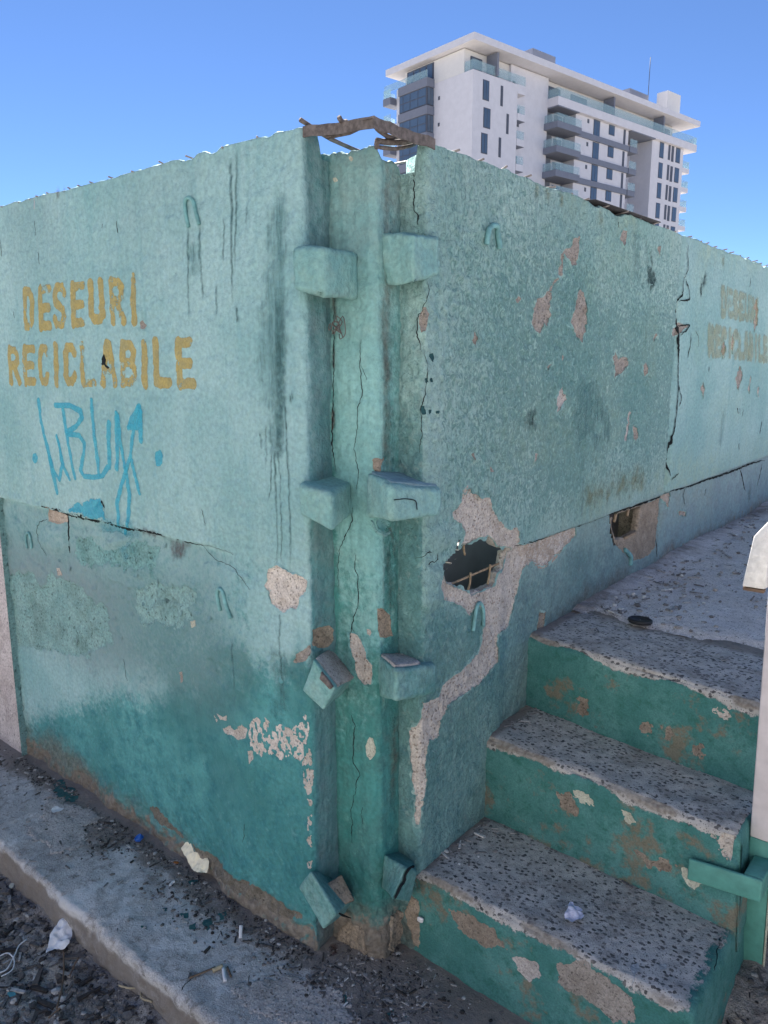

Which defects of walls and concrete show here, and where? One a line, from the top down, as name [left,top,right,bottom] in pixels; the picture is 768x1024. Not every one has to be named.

crack [515,245,765,554]
crack [331,301,367,639]
crack [36,500,249,589]
spalling [609,492,687,561]
spalling [264,563,308,616]
spalling [293,608,420,687]
spalling [407,484,578,829]
peeling [214,714,314,847]
crack [350,715,363,836]
peeling [556,790,594,817]
peeling [448,909,541,982]
peeling [556,959,636,1024]